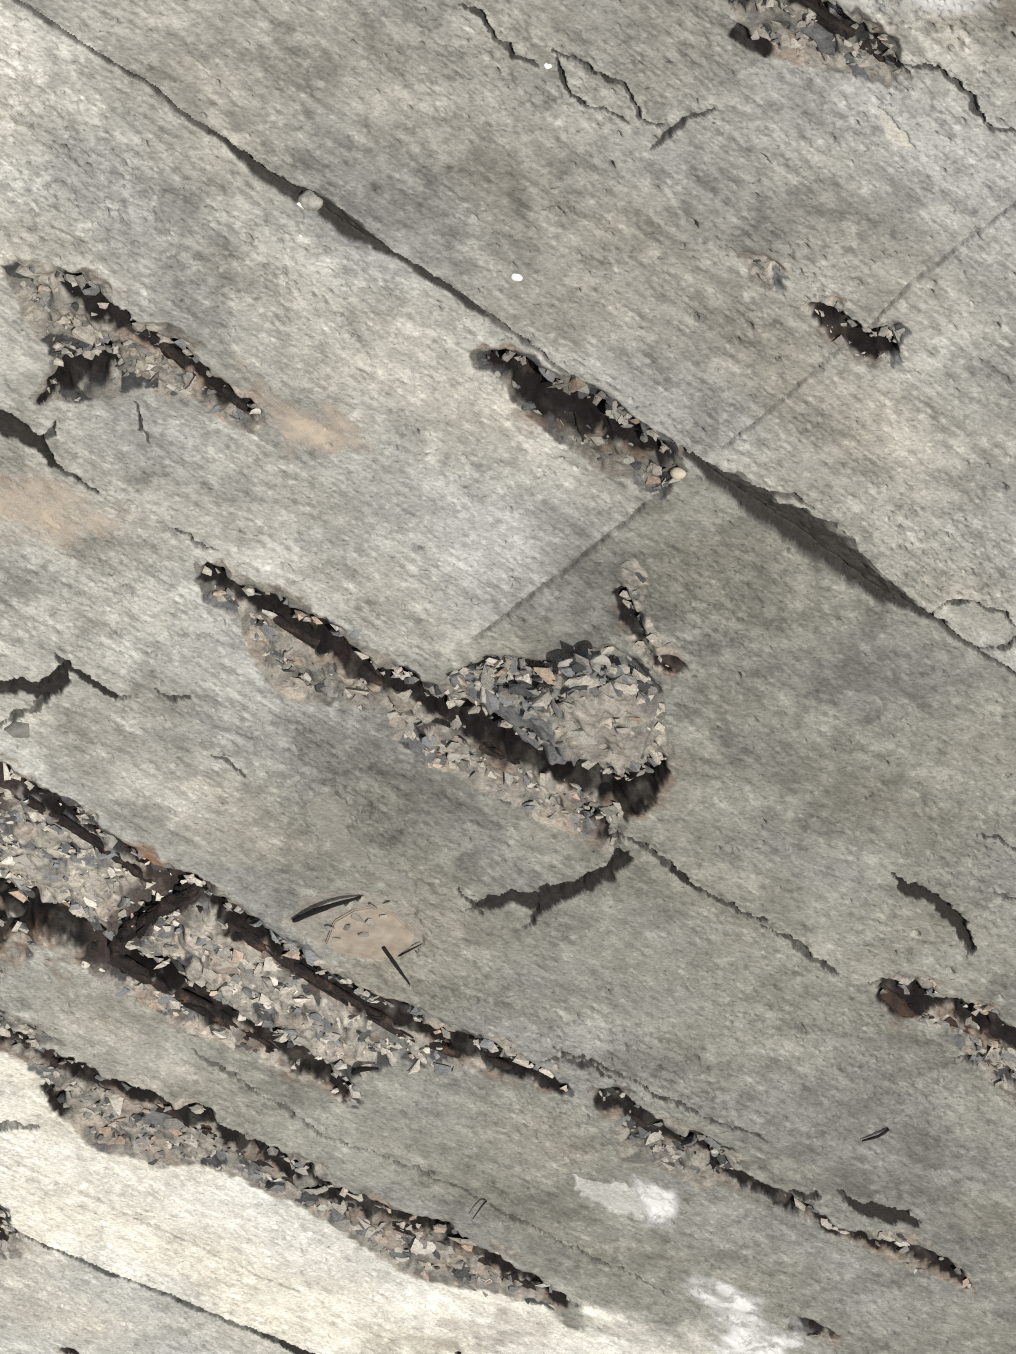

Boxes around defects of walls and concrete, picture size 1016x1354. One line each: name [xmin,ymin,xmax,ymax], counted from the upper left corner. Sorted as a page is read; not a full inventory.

crack [457,3,717,153]
spalling [705,0,913,88]
crack [899,60,1016,135]
crack [0,409,99,496]
spalling [0,258,266,435]
spalling [469,341,688,501]
spalling [799,295,912,371]
crack [931,599,1016,653]
spalling [193,558,688,858]
crack [456,828,839,977]
crack [890,872,977,960]
spalling [0,749,977,1312]